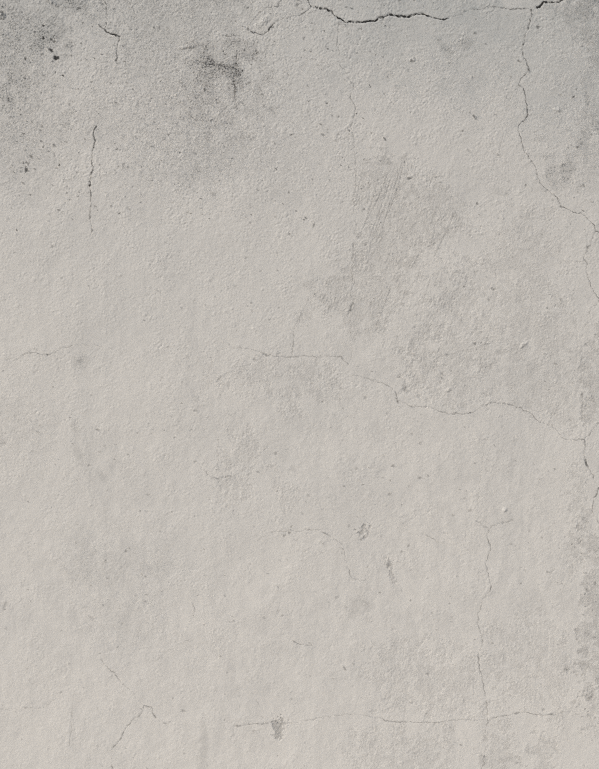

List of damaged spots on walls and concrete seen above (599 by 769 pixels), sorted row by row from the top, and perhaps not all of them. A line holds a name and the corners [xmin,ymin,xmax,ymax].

crack [310,5,447,23]